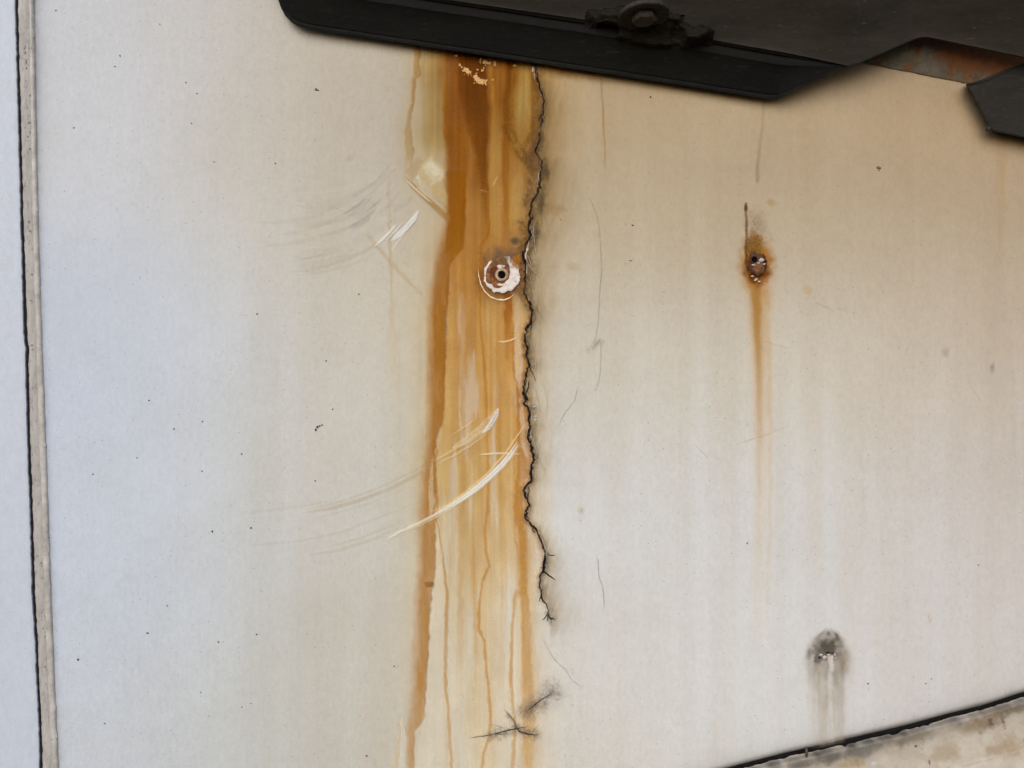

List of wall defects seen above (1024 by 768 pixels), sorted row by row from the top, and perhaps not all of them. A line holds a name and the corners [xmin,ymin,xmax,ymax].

corrosion [411,48,548,725]
crack [473,64,602,741]
corrosion [744,205,773,378]